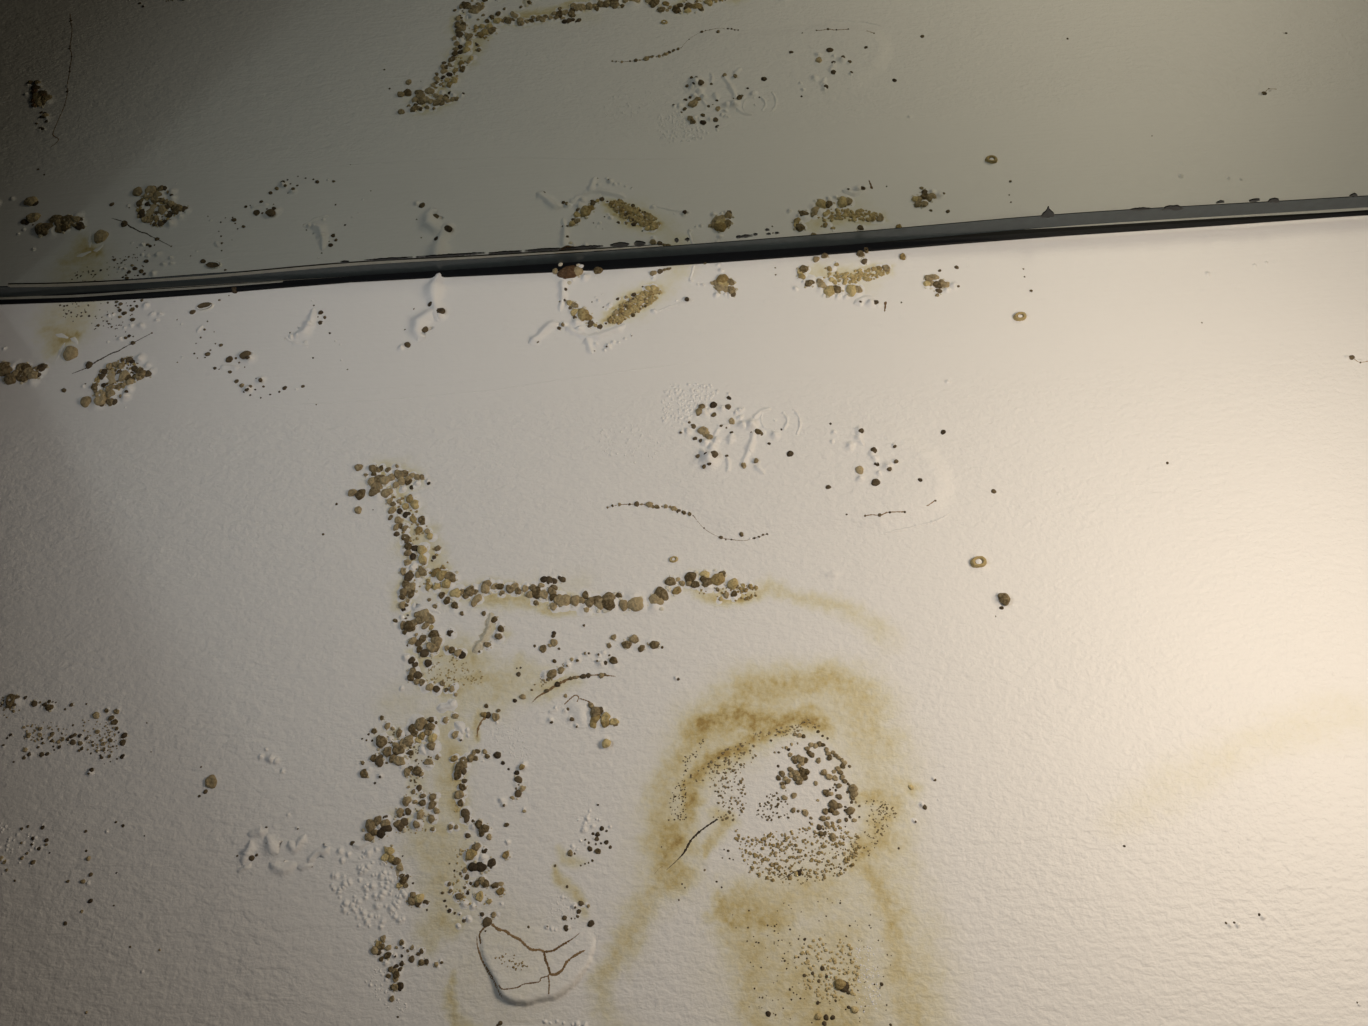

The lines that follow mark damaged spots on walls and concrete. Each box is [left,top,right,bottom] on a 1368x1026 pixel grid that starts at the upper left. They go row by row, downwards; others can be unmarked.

damp [350,448,992,1026]
crack [607,499,768,541]